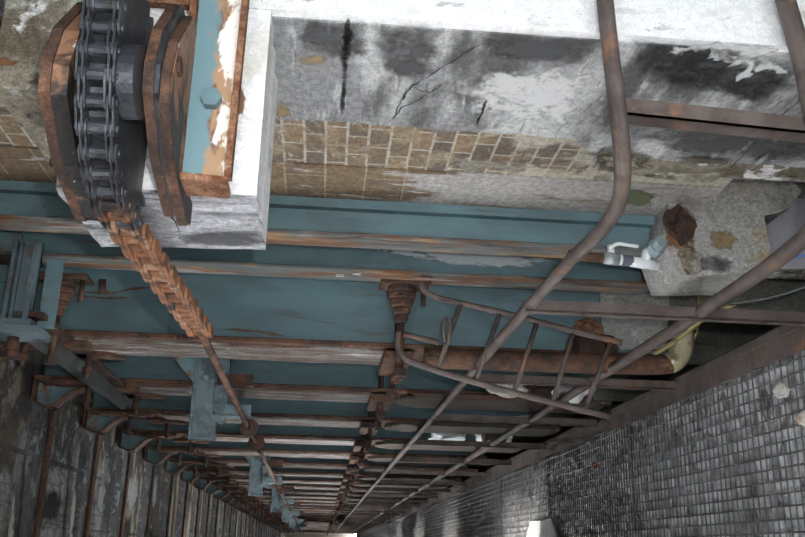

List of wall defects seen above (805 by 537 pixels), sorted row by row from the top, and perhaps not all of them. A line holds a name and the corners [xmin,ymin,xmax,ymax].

crack [393,44,481,118]
leakage [672,42,788,82]